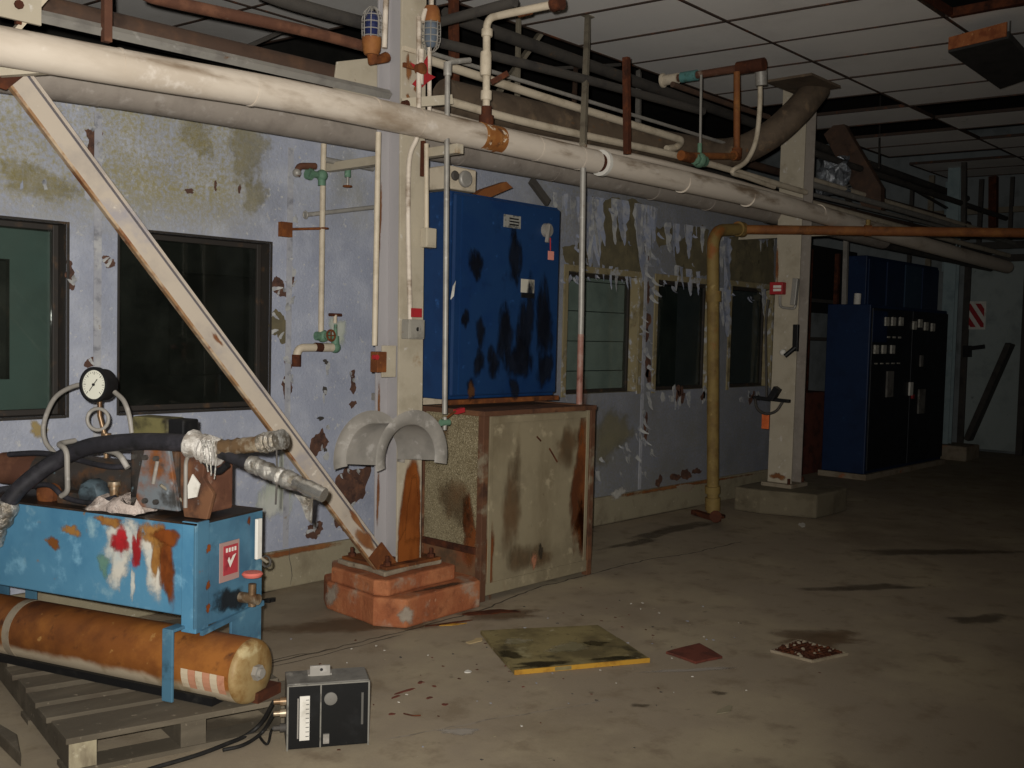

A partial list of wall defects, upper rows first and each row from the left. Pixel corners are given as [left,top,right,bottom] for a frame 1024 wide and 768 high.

peeling [272,276,297,399]
peeling [558,196,709,441]
peeling [310,428,329,457]
peeling [335,465,371,507]
peeling [655,468,702,487]
peeling [305,519,343,539]